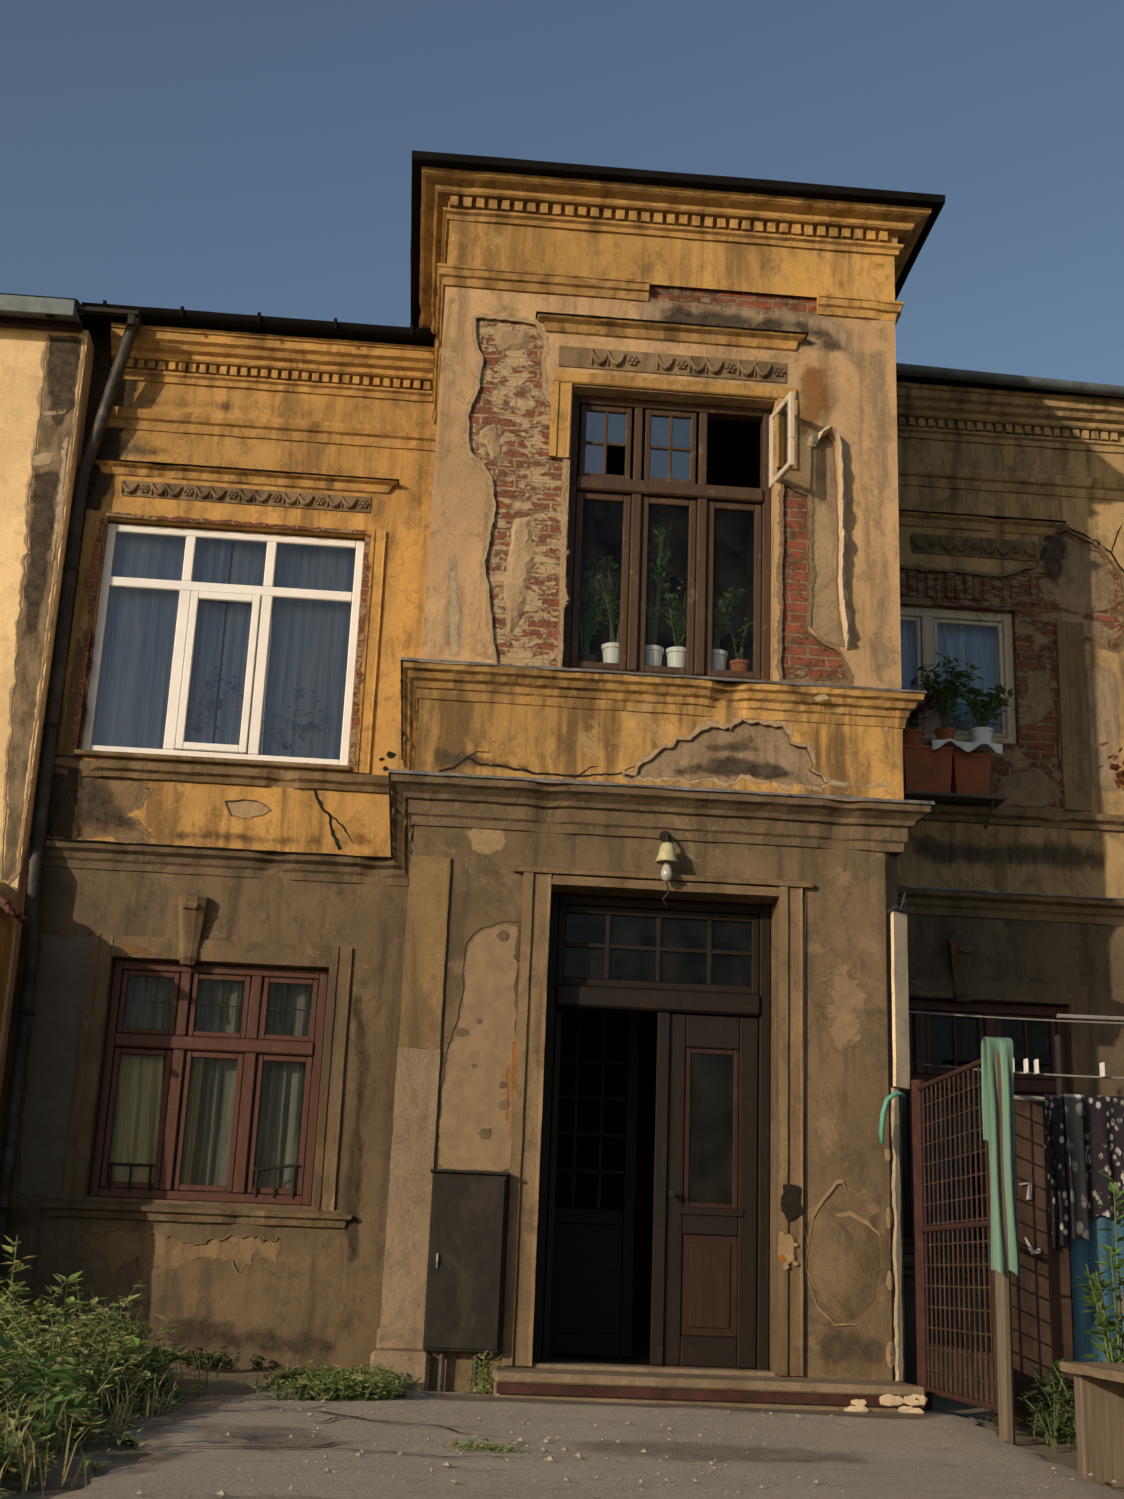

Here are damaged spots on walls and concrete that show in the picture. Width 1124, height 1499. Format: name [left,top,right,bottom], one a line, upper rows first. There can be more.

flaking render [463,313,572,670]
damp [47,334,155,840]
flaking render [775,426,854,701]
flaking render [899,524,1124,813]
crack [438,751,635,778]
flaking render [621,717,832,793]
damp [675,742,788,778]
crack [314,790,352,850]
crack [301,1416,347,1447]